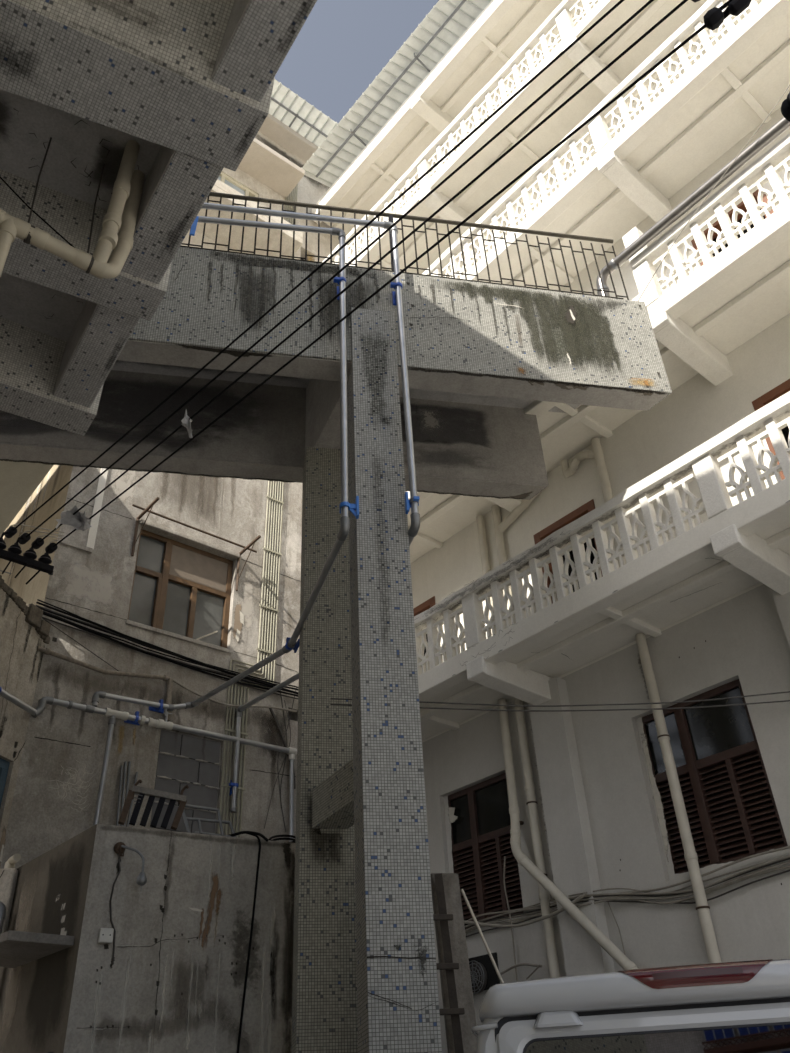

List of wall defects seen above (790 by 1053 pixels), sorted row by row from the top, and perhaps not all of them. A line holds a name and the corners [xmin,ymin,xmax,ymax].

damp [71,139,124,202]
damp [208,252,380,335]
damp [419,281,620,368]
damp [361,334,391,425]
crack [126,831,225,1045]
rust [199,874,222,948]
damp [233,843,295,1053]
crack [367,953,436,961]